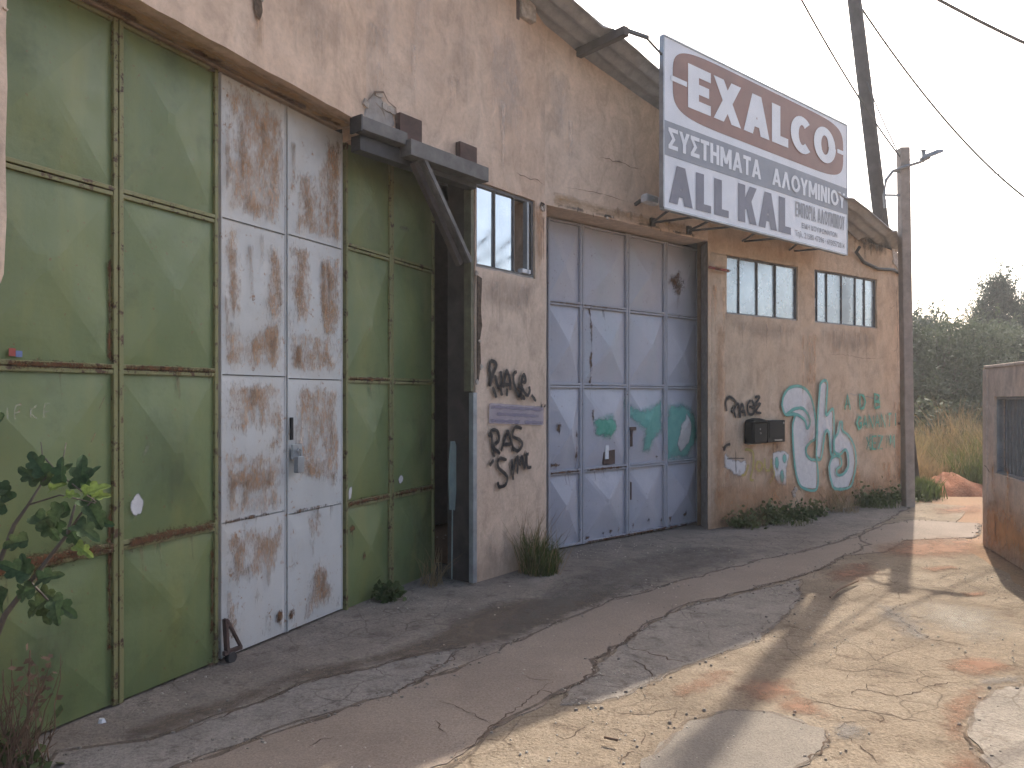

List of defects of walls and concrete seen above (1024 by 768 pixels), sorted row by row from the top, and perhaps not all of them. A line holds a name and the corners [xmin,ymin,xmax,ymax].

rust [227,95,280,218]
rust [299,145,339,239]
spalling [363,93,396,127]
rust [227,254,281,367]
rust [294,251,339,369]
rust [126,365,215,373]
rust [129,441,279,550]
rust [26,505,114,650]